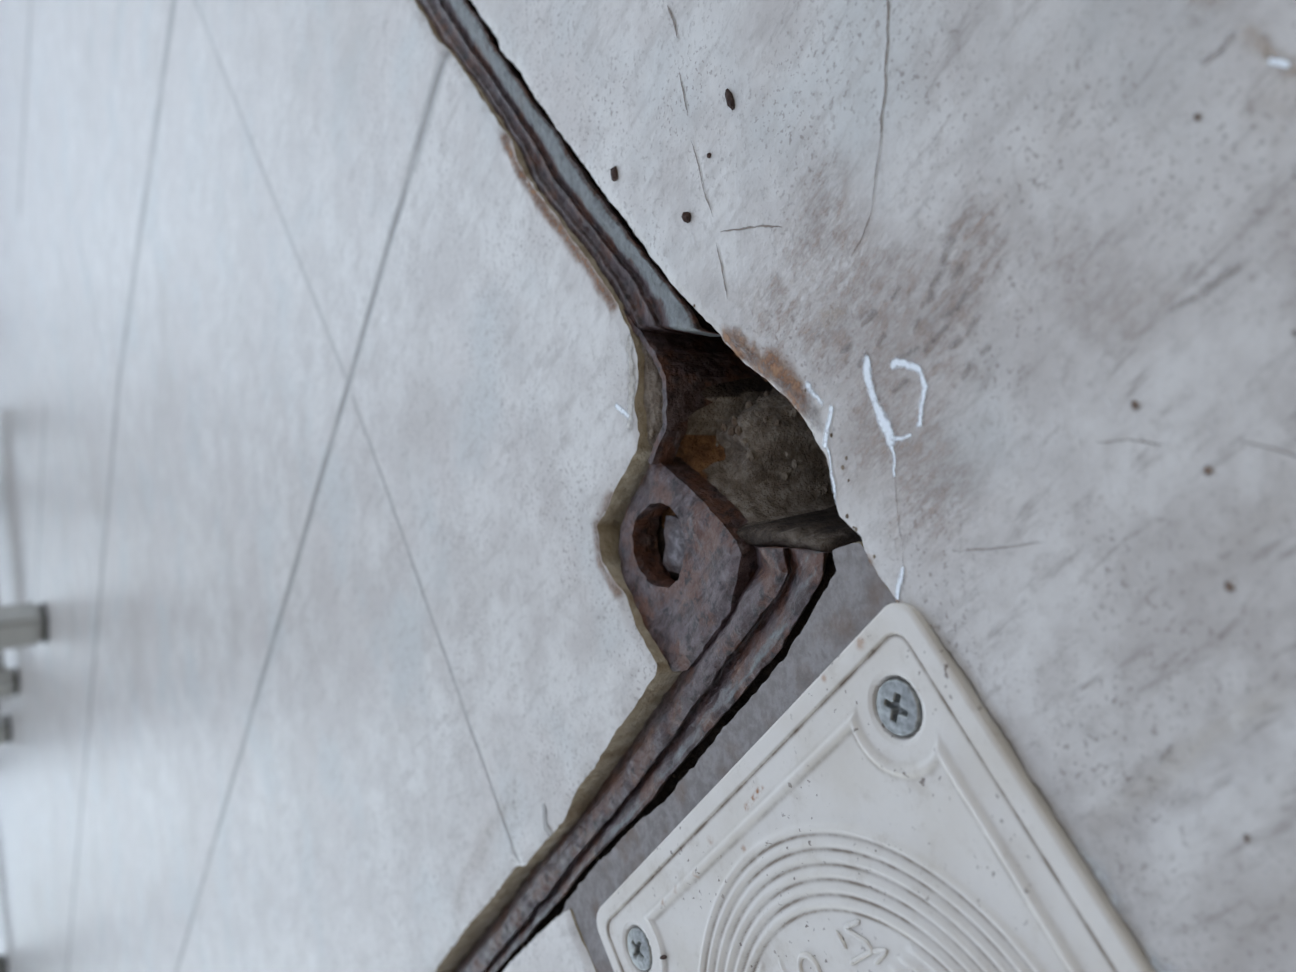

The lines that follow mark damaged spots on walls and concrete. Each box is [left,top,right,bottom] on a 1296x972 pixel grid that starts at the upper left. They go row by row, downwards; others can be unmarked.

crack [852,0,889,254]
rust [501,134,615,308]
spalling [615,335,662,429]
spalling [680,294,730,348]
rust [723,330,806,413]
spalling [679,374,862,556]